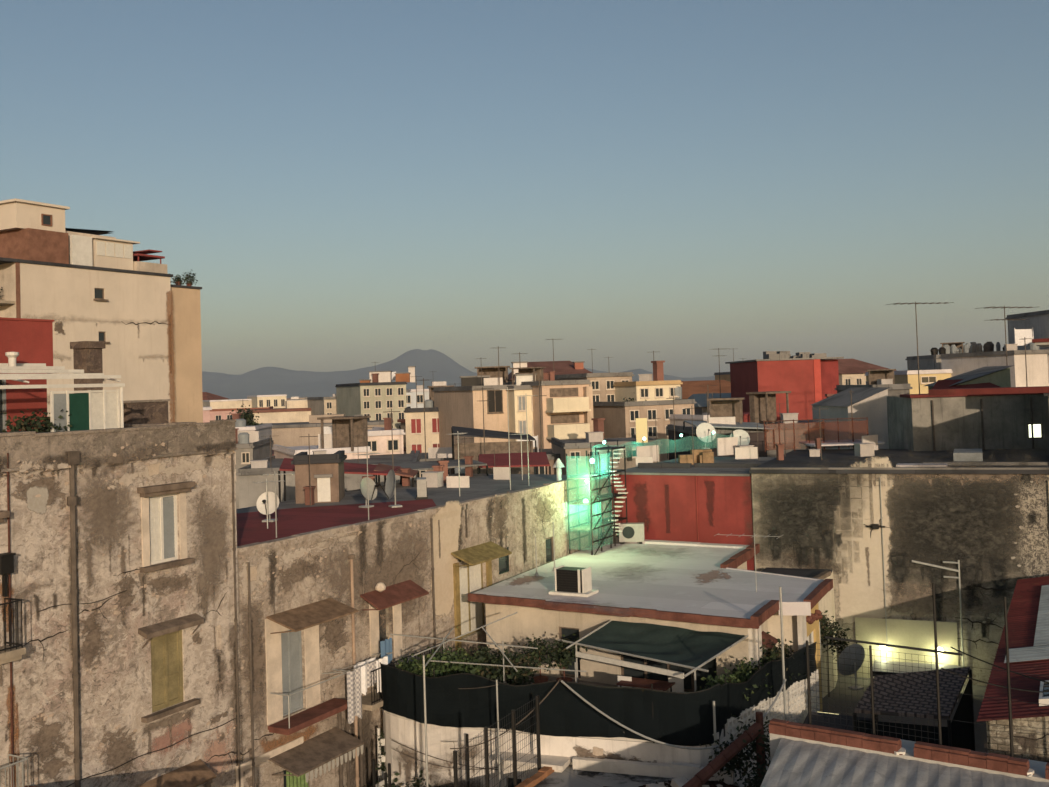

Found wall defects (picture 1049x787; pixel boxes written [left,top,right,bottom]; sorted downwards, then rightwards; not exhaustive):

spalling [0,460,71,514]
crack [21,569,140,658]
water stain [15,442,168,673]
water stain [191,441,236,621]
water stain [486,500,502,541]
water stain [751,461,1045,636]